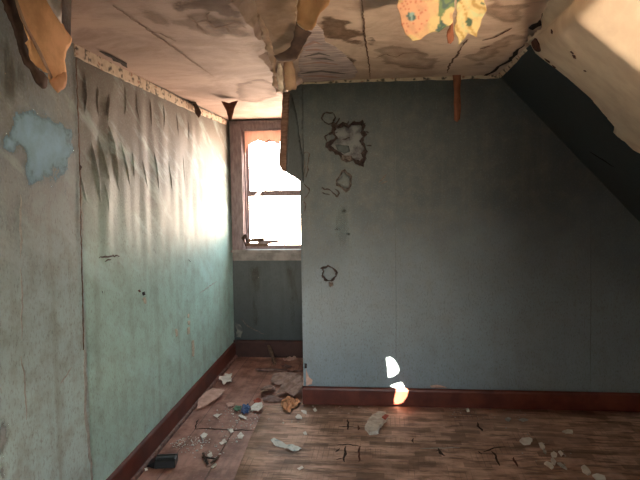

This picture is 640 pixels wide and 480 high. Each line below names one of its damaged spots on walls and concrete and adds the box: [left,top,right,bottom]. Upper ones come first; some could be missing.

crack [112,5,213,77]
damp [321,17,363,44]
crack [361,0,428,77]
crack [447,28,512,73]
crack [484,45,525,76]
peeling [4,111,73,185]
peeling [321,112,372,197]
peeling [320,265,338,287]